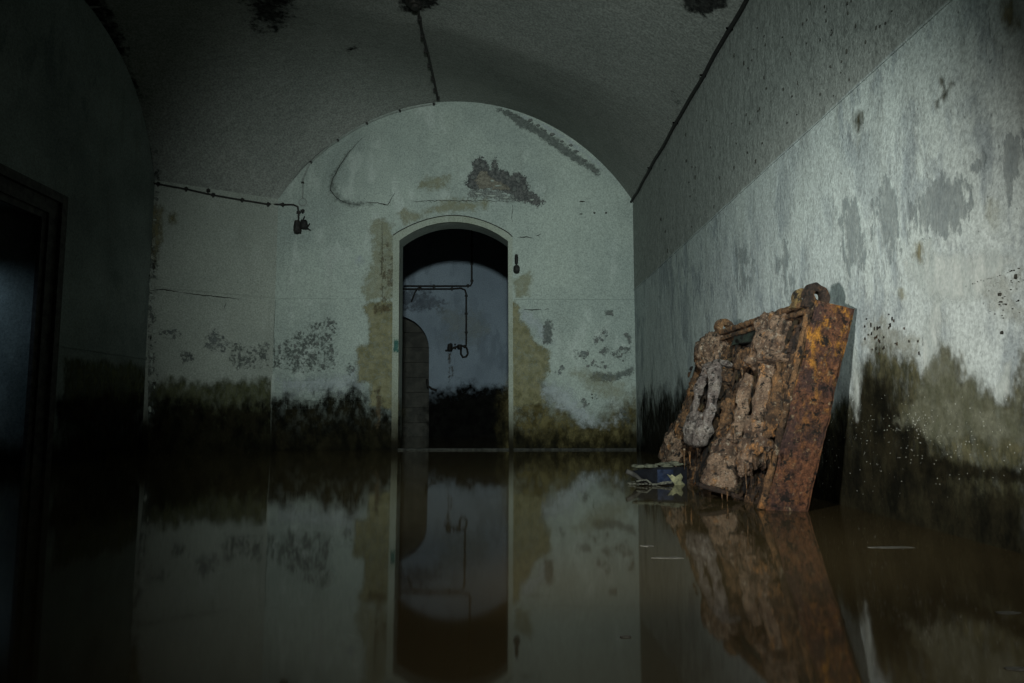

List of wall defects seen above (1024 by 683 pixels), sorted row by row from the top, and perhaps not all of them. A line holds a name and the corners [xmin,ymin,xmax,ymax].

spalling [463,156,546,209]
peeling [205,320,355,375]
leakage [283,219,444,409]
leakage [513,275,592,426]
peeling [577,330,634,408]
leakage [902,239,1024,444]